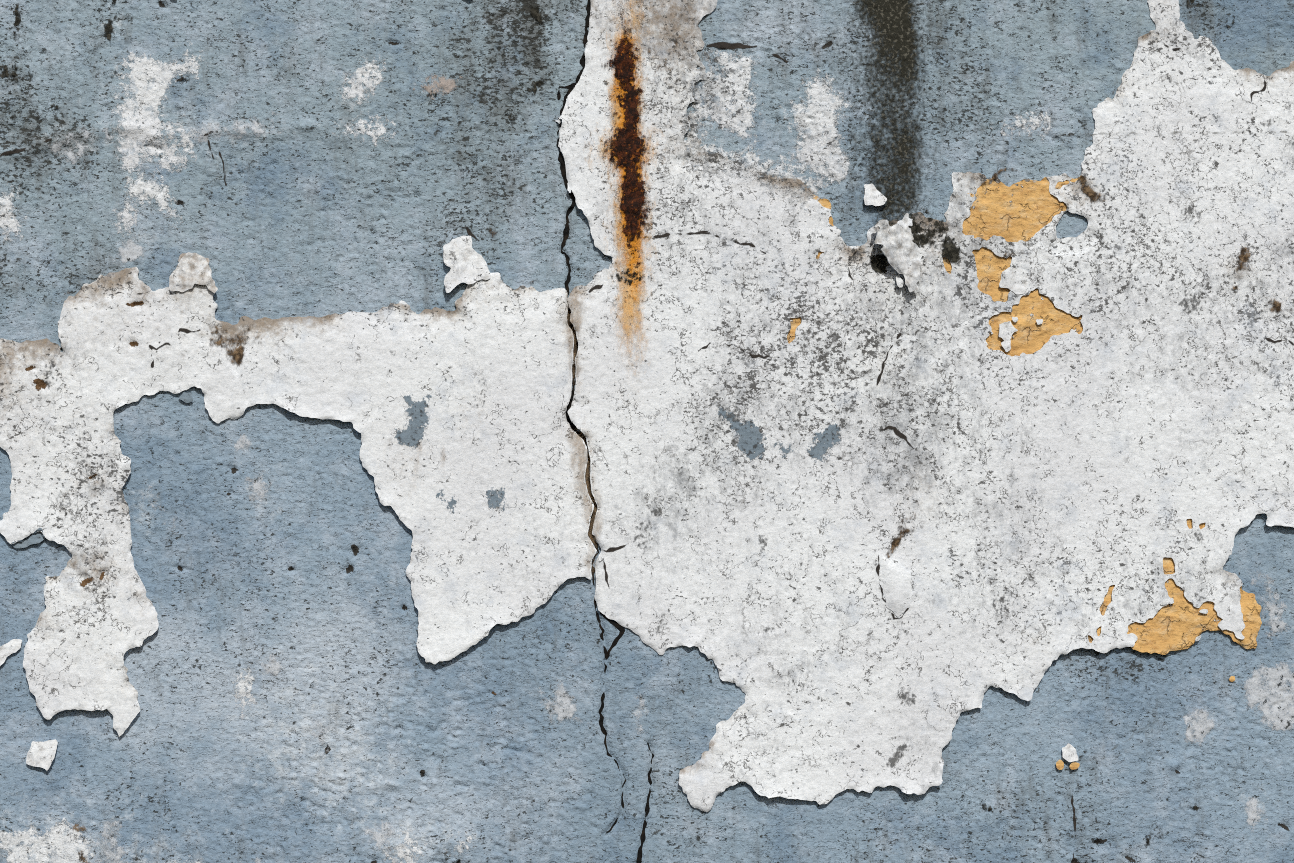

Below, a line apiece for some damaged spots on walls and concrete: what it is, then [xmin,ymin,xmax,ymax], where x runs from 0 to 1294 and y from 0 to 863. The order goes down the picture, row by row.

peeling [0,236,597,737]
crack [556,0,654,863]
rust [601,6,653,338]
leakage [854,0,965,265]
peeling [555,0,1294,812]